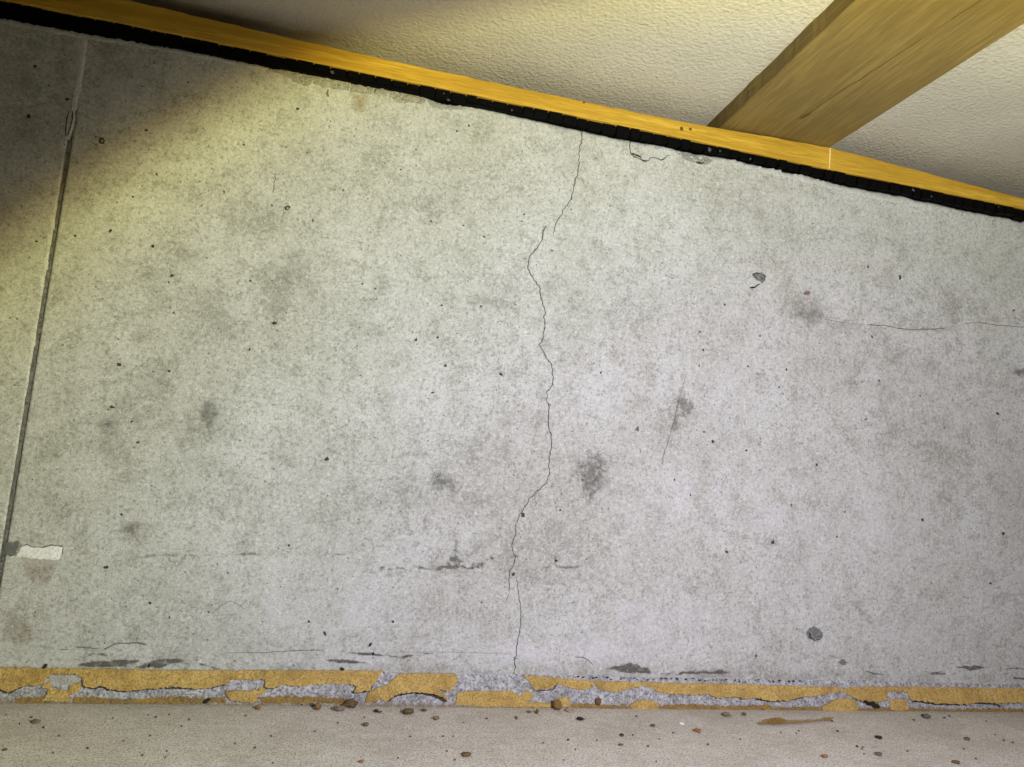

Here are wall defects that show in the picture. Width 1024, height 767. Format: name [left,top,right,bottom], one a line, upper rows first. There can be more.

crack [629,142,670,162]
crack [502,131,583,674]
peeling [3,541,64,567]
crack [227,647,313,655]
peeling [0,666,1024,712]